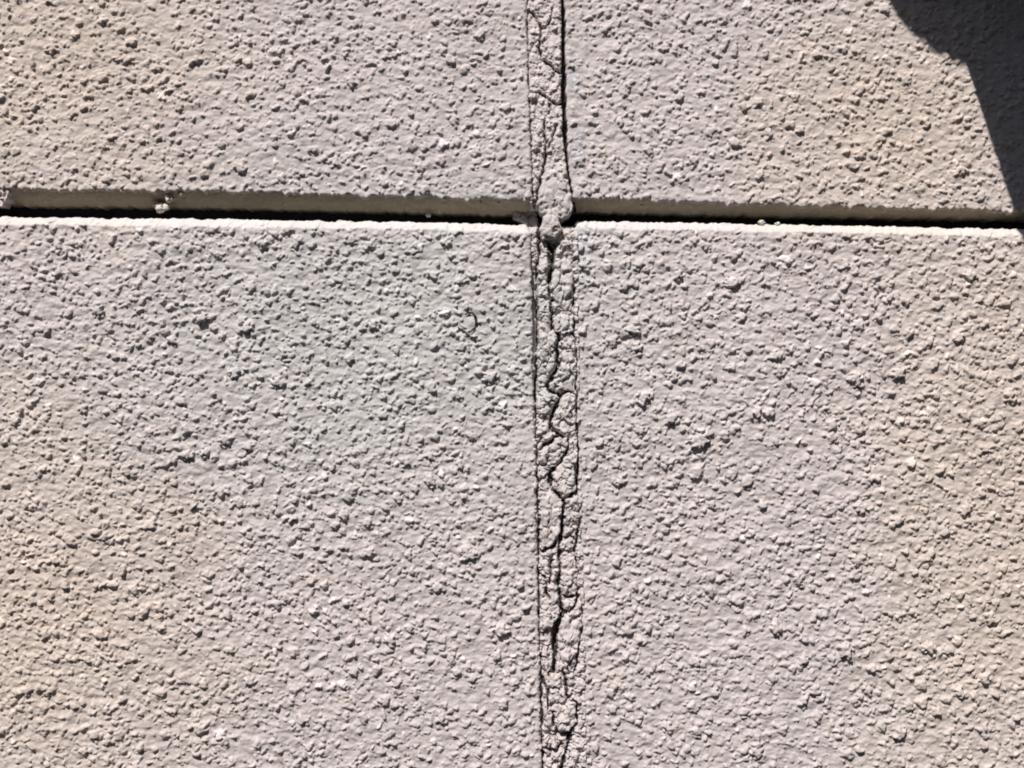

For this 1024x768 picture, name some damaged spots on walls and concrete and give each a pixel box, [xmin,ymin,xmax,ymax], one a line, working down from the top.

crack [526,0,583,768]